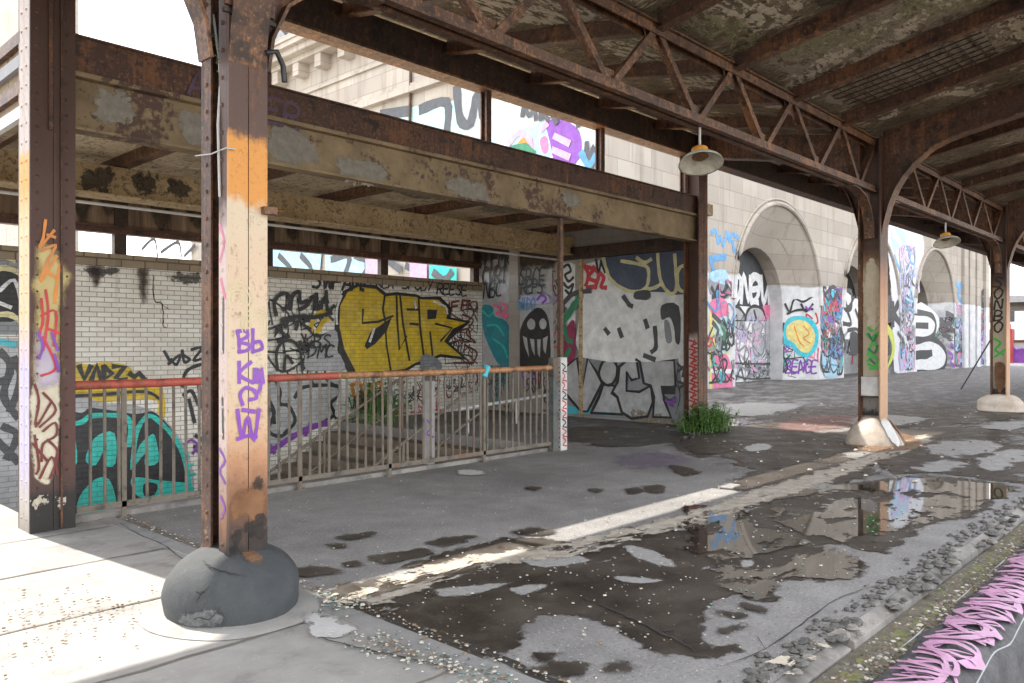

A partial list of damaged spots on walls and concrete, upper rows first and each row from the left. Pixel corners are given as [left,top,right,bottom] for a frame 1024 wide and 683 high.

peeling [91,88,135,125]
peeling [267,125,319,167]
water stain [76,164,117,220]
water stain [131,170,193,230]
water stain [187,210,201,228]
peeling [334,156,515,214]
water stain [137,268,148,302]
rust [230,487,266,521]
crack [121,523,247,624]
spalling [178,607,224,628]